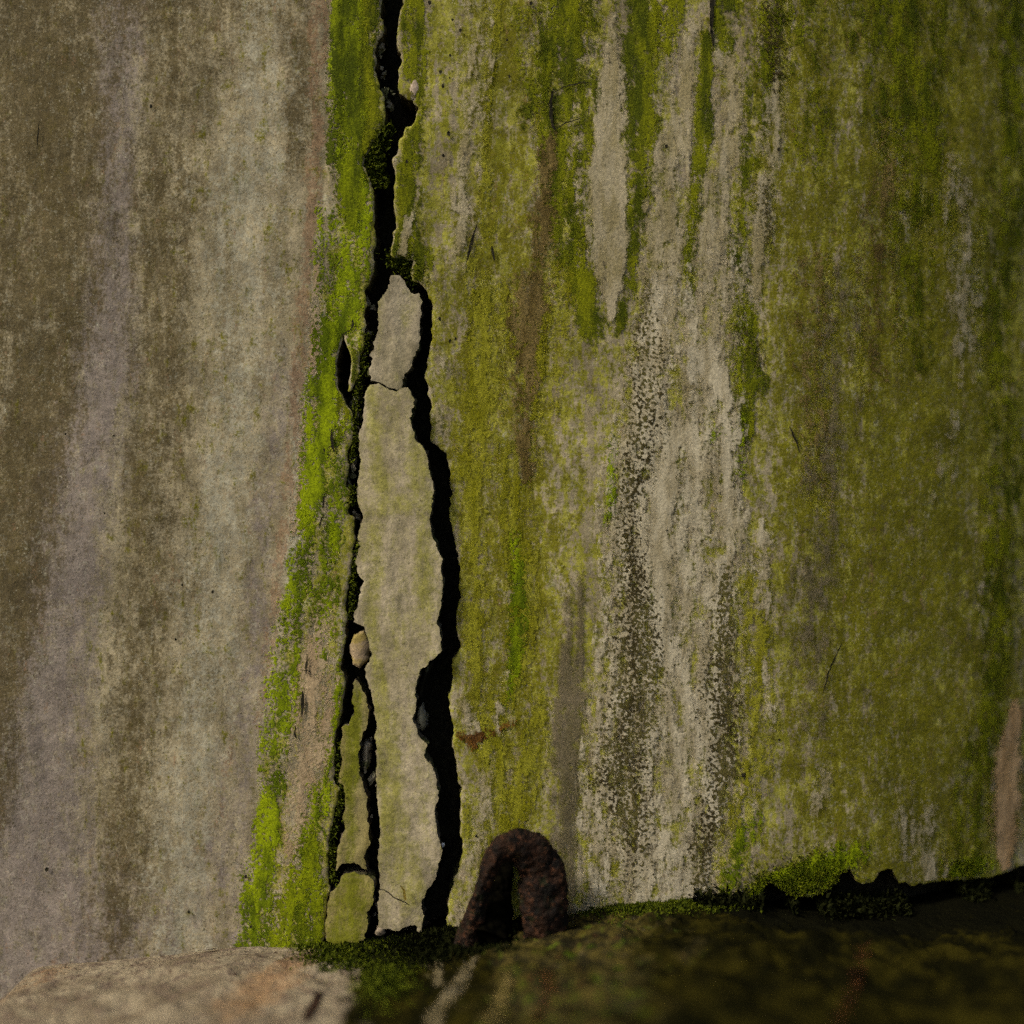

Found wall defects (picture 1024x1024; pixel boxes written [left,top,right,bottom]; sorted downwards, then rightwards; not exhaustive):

crack [323,0,463,930]
rust [474,862,514,945]
damp [431,0,984,927]